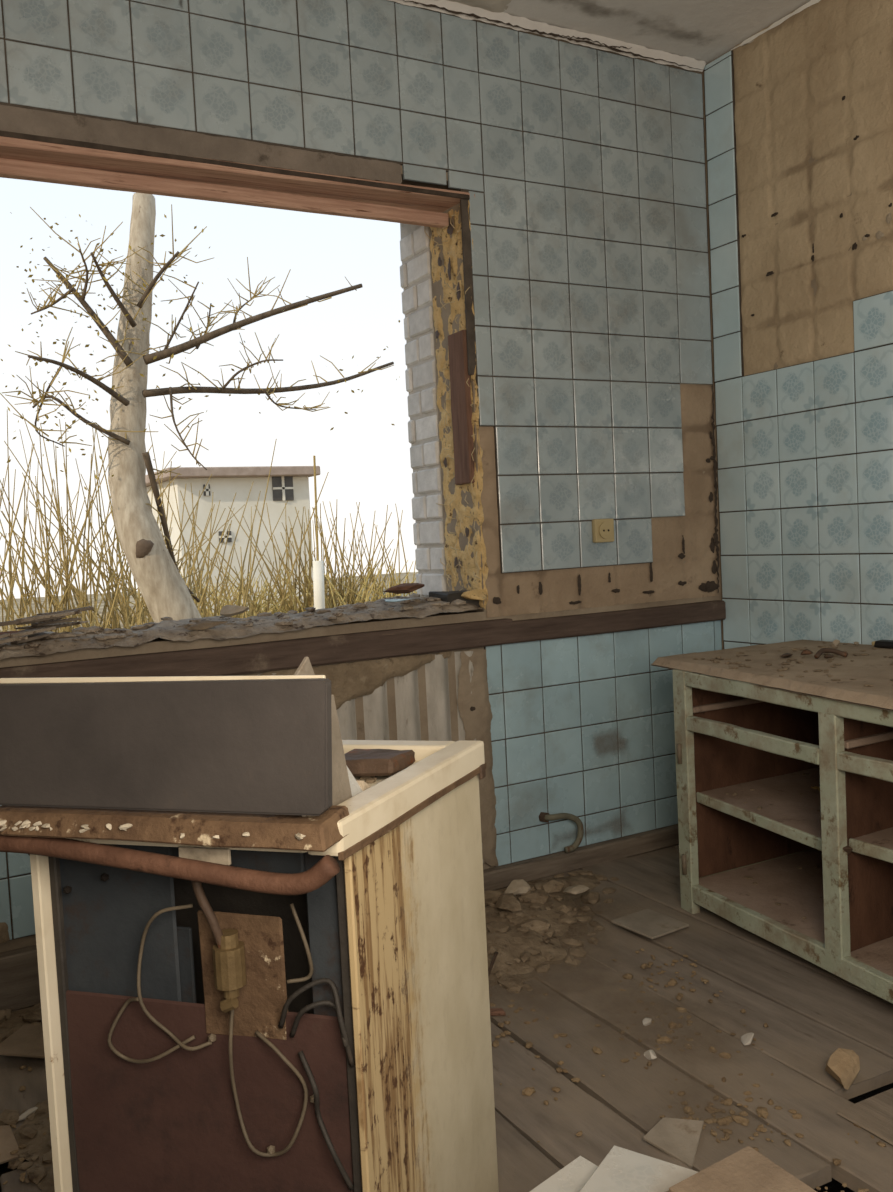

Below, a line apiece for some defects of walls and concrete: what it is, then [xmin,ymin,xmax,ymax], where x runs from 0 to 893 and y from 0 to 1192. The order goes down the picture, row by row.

peeling [731,0,893,376]
peeling [424,200,718,618]
peeling [247,668,298,676]
peeling [313,649,498,866]